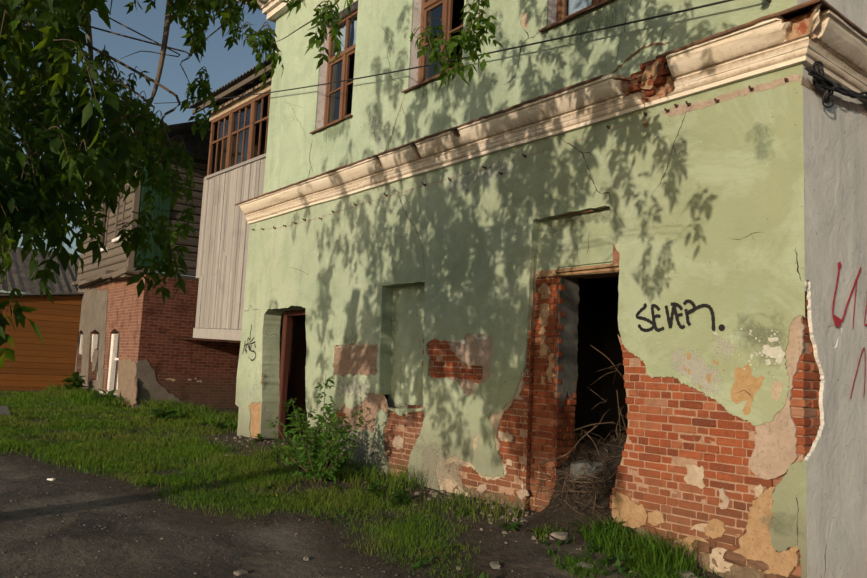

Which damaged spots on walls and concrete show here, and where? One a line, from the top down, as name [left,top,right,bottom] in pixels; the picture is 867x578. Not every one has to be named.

crack [560,137,624,225]
peeling [115,358,137,405]
peeling [334,343,378,376]
flaking render [328,393,425,480]
flaking render [422,333,493,397]
flaking render [436,295,535,510]
flaking render [610,280,821,578]